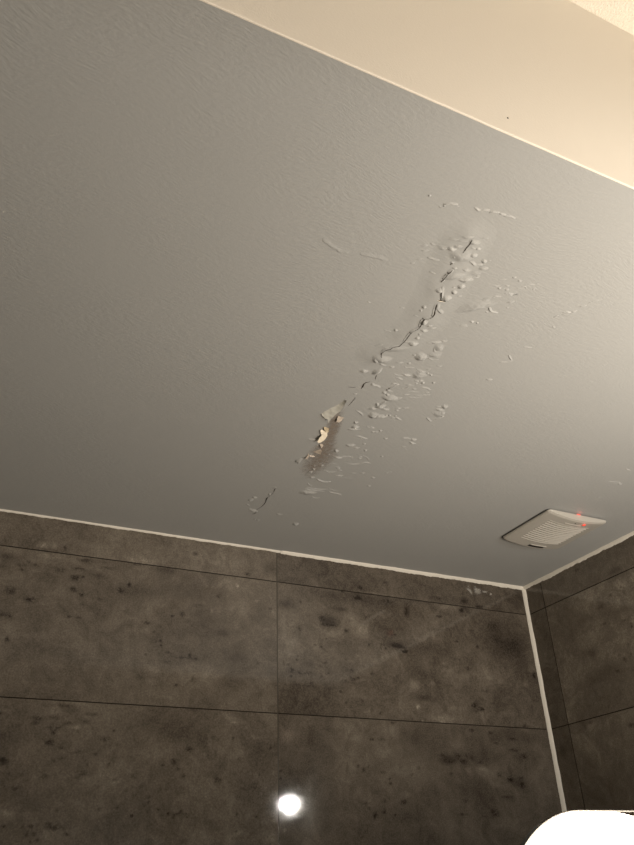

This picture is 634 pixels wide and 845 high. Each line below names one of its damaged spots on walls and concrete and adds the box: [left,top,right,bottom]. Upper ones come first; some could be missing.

crack [348,241,472,406]
peeling [296,400,347,464]